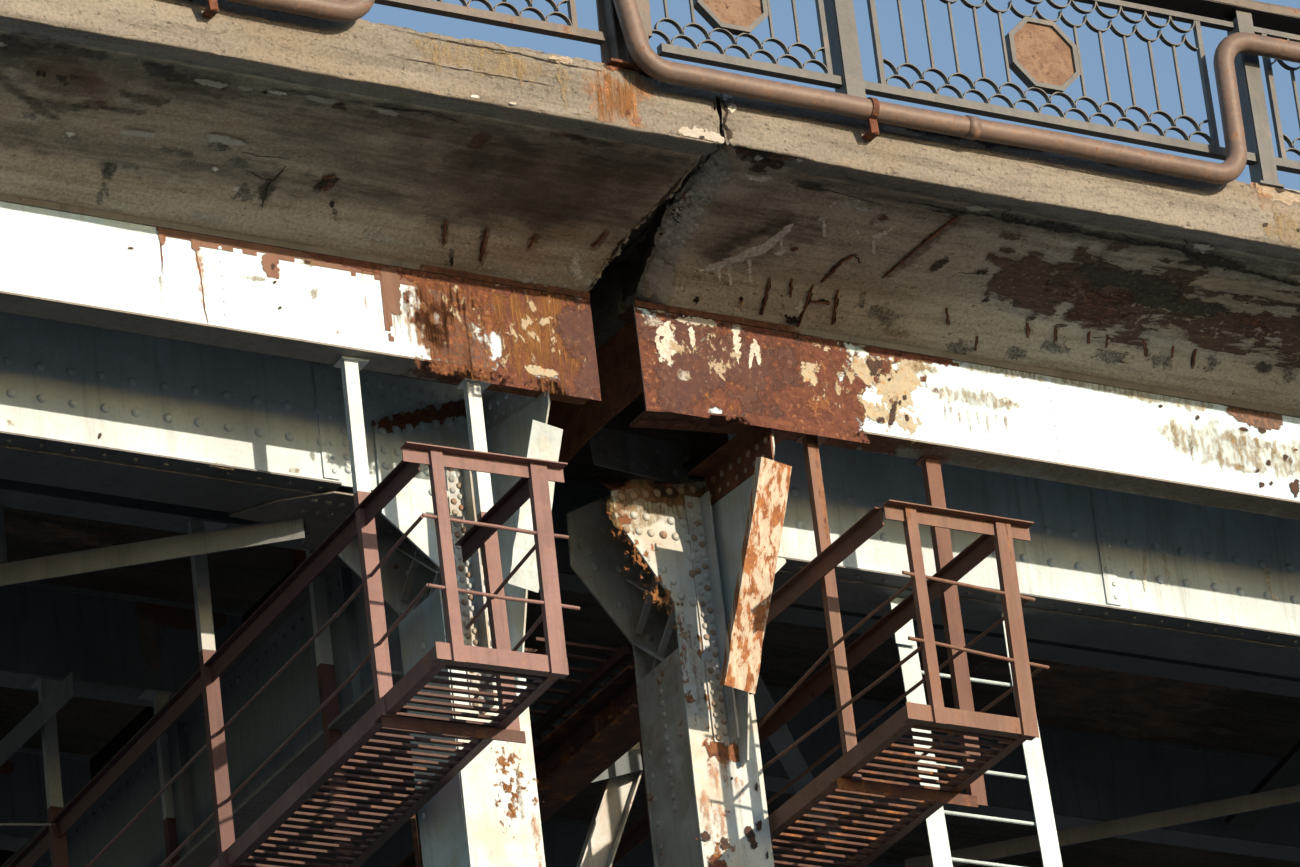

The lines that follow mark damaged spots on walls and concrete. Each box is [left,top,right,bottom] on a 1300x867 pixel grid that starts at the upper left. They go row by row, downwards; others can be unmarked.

leakage [0,77,169,120]
rust [591,63,652,127]
crack [711,91,736,143]
leakage [97,162,140,209]
spalling [1256,183,1300,205]
spalling [881,214,1300,370]
rust [156,227,601,433]
peeling [848,345,936,442]
rust [631,307,1300,519]
peeling [939,386,1019,432]
rust [607,477,745,843]